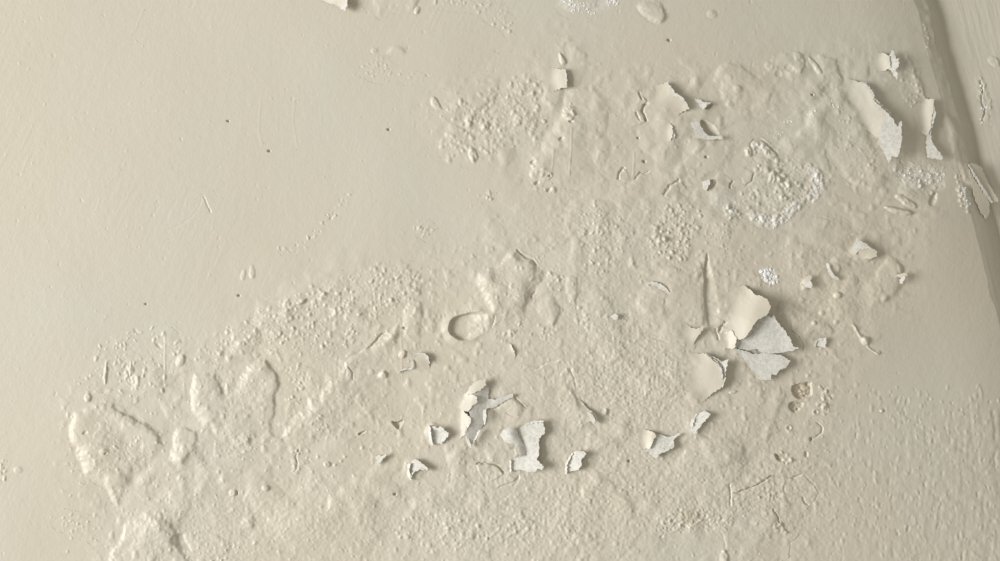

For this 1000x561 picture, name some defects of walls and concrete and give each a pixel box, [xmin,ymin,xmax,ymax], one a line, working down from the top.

peeling [644,81,723,145]
peeling [838,72,998,219]
peeling [637,285,798,458]
peeling [428,379,513,448]
peeling [407,459,428,481]
peeling [500,420,545,472]
peeling [565,451,586,474]